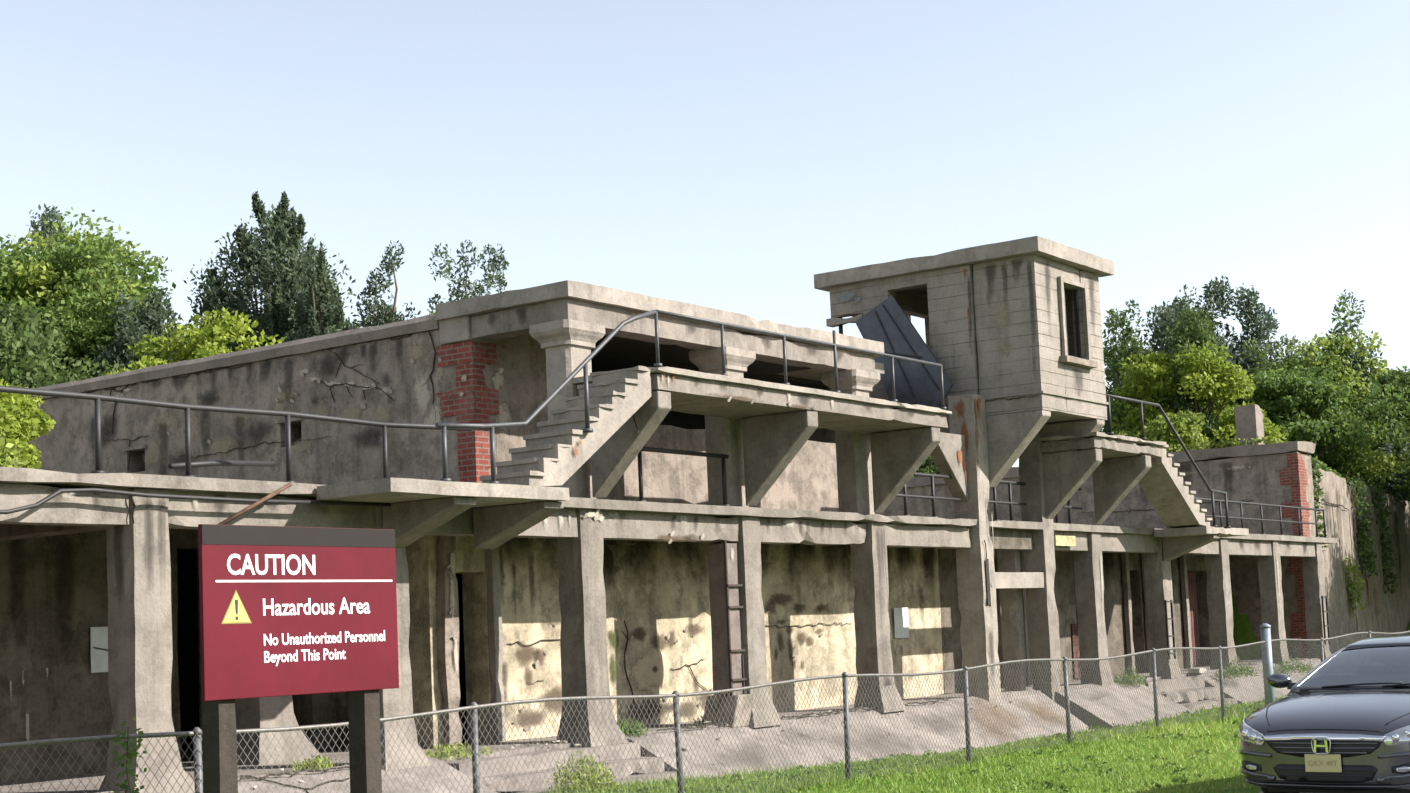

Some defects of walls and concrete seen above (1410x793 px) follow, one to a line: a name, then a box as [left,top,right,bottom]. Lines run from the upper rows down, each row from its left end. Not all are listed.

crack [57,359,269,524]
crack [179,331,440,458]
rust [956,398,981,477]
crack [622,620,730,731]
crack [780,699,949,719]